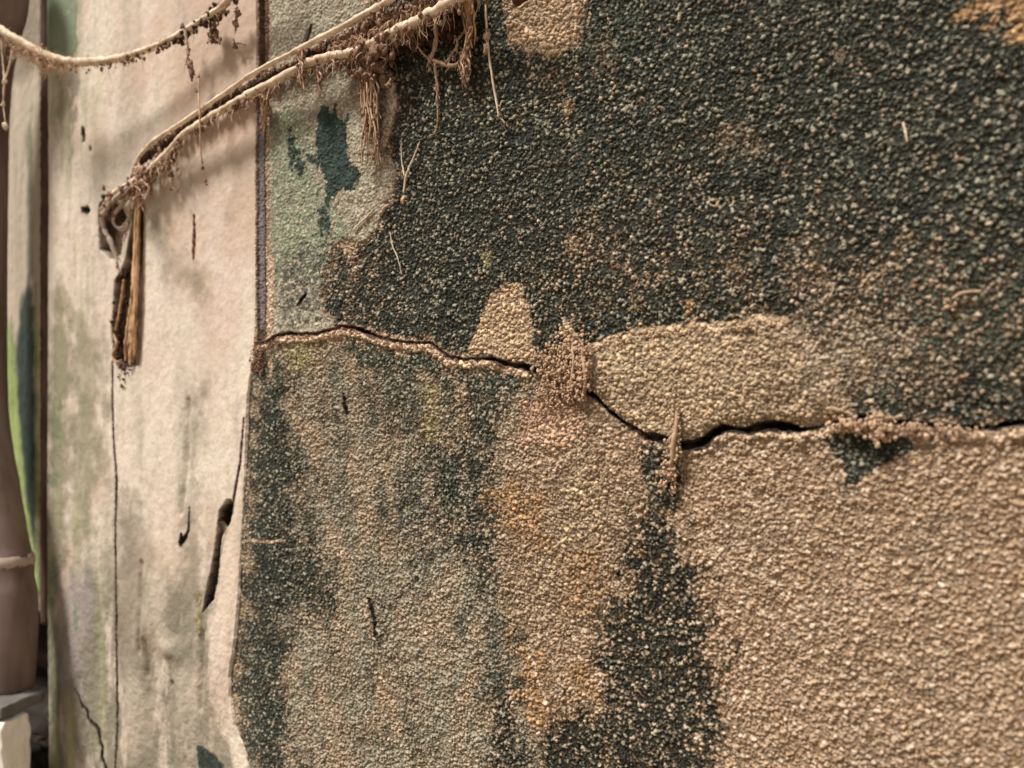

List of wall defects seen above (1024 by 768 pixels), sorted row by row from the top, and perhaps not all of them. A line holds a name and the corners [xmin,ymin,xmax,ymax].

crack [341,392,349,414]
water stain [377,371,425,434]
crack [582,387,1024,451]
water stain [638,443,687,524]
water stain [360,460,446,691]